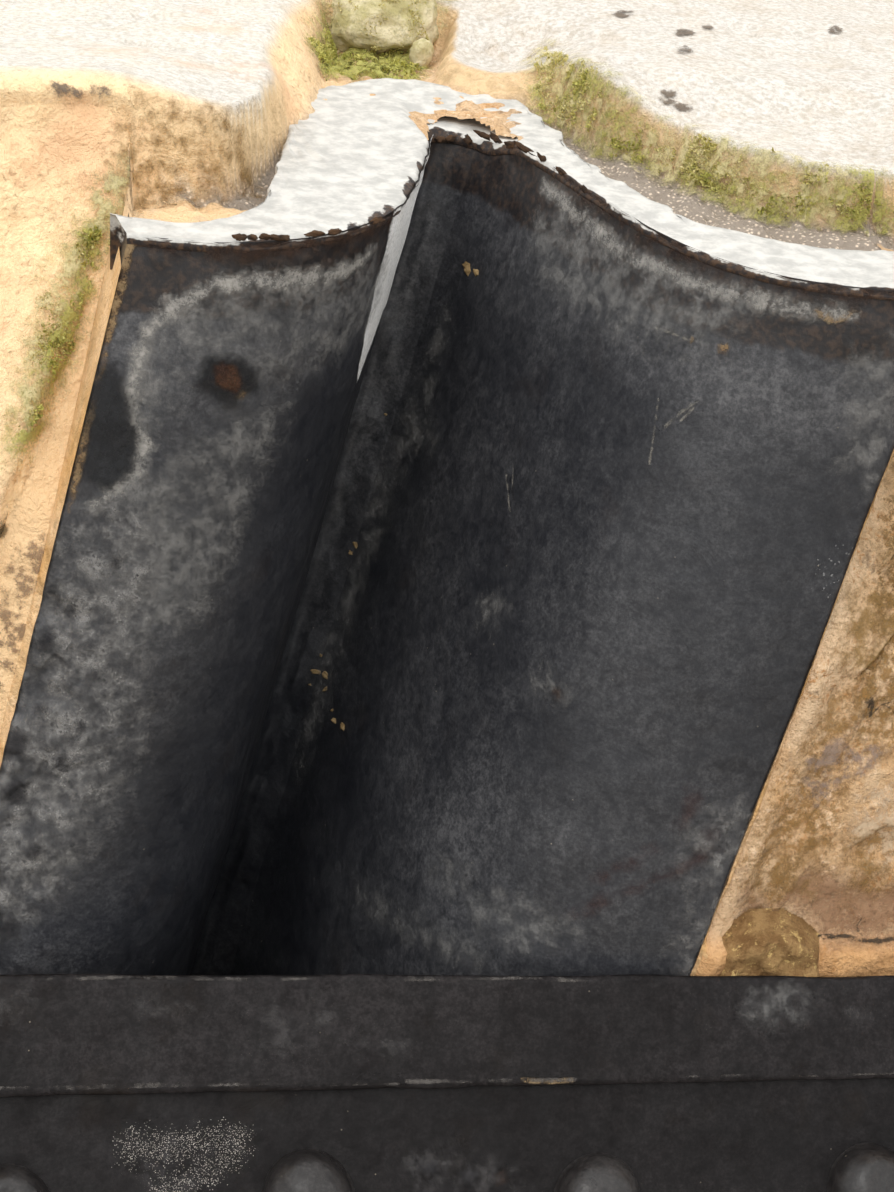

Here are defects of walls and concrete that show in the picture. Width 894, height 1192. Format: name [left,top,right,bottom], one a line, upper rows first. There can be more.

damp [86,136,433,511]
rust [199,358,257,406]
crack [817,918,894,944]